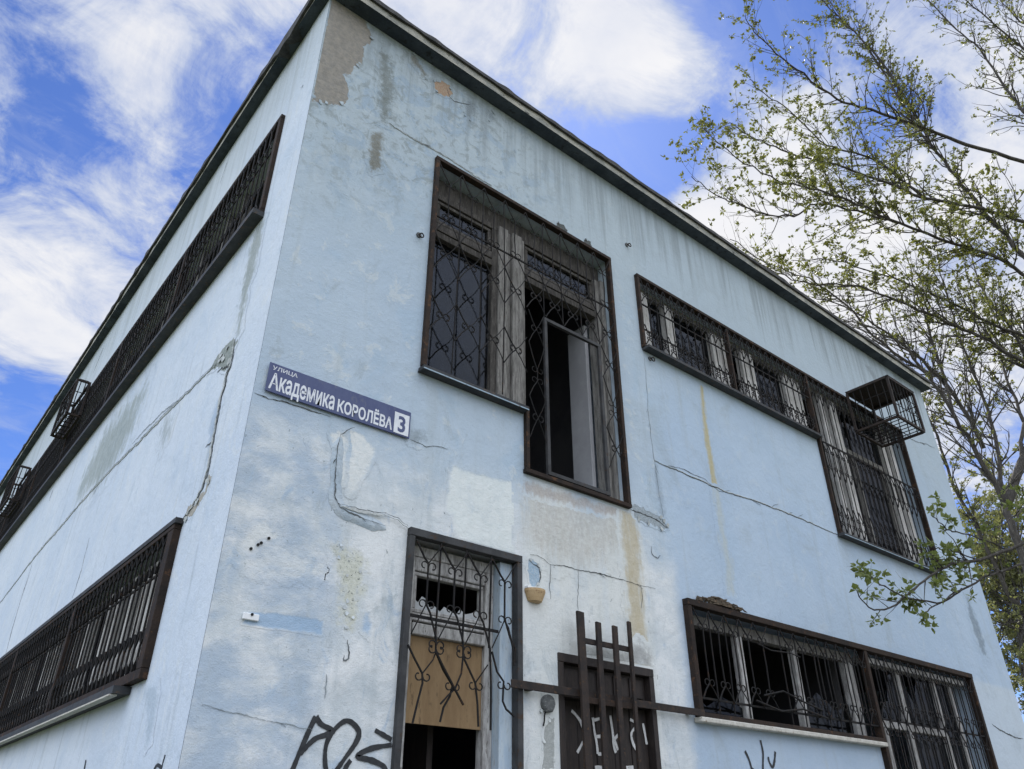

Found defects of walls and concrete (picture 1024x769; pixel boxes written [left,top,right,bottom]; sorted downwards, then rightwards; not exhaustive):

peeling [300,0,378,112]
crack [0,339,236,651]
crack [256,393,408,528]
damp [512,465,619,587]
crack [530,554,651,608]
crack [631,358,837,559]